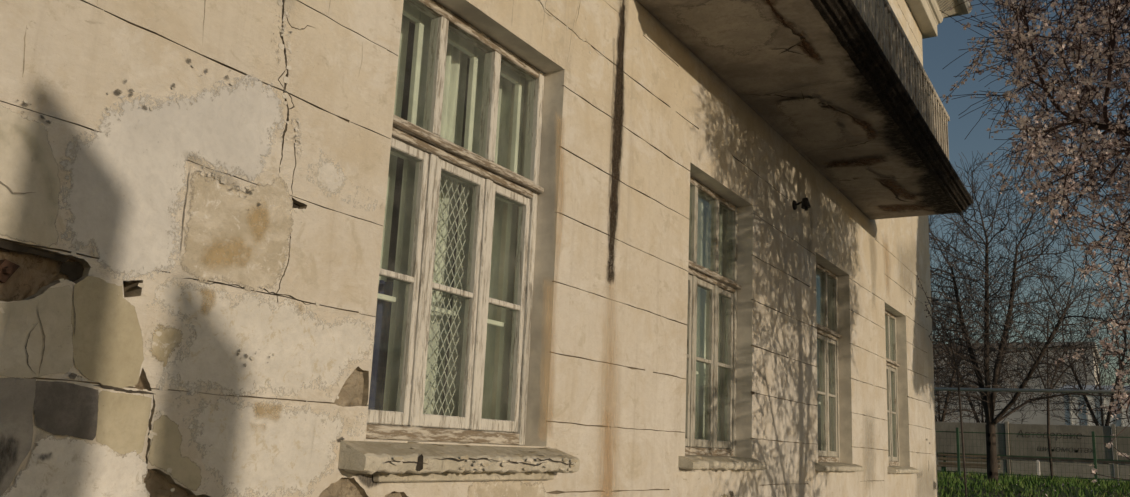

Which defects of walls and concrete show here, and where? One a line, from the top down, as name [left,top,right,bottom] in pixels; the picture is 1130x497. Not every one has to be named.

crack [274,0,303,186]
water stain [607,0,625,282]
water stain [811,0,973,216]
peeling [0,100,378,497]